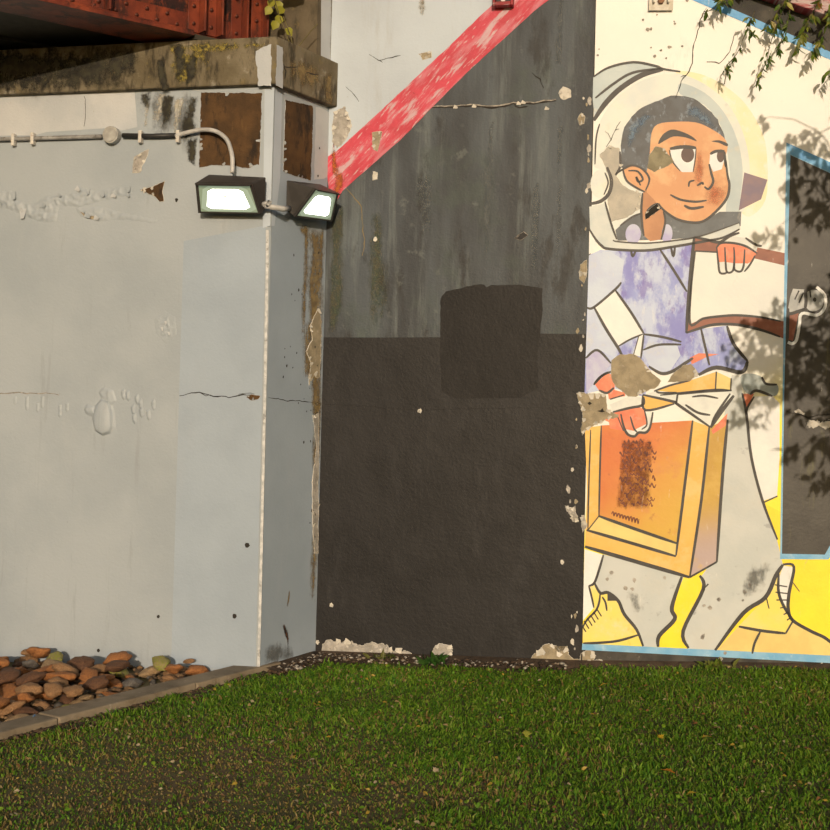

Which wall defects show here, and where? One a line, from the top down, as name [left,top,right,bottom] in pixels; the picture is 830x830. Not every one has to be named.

water stain [0,48,136,91]
water stain [142,43,262,164]
crack [432,74,556,110]
spalling [558,86,571,100]
peeling [199,92,263,169]
peeling [283,99,320,181]
peeling [611,354,699,397]
crack [0,392,69,418]
crack [179,392,321,404]
spalling [575,392,619,436]
peeling [316,638,412,654]
peeling [432,643,453,655]